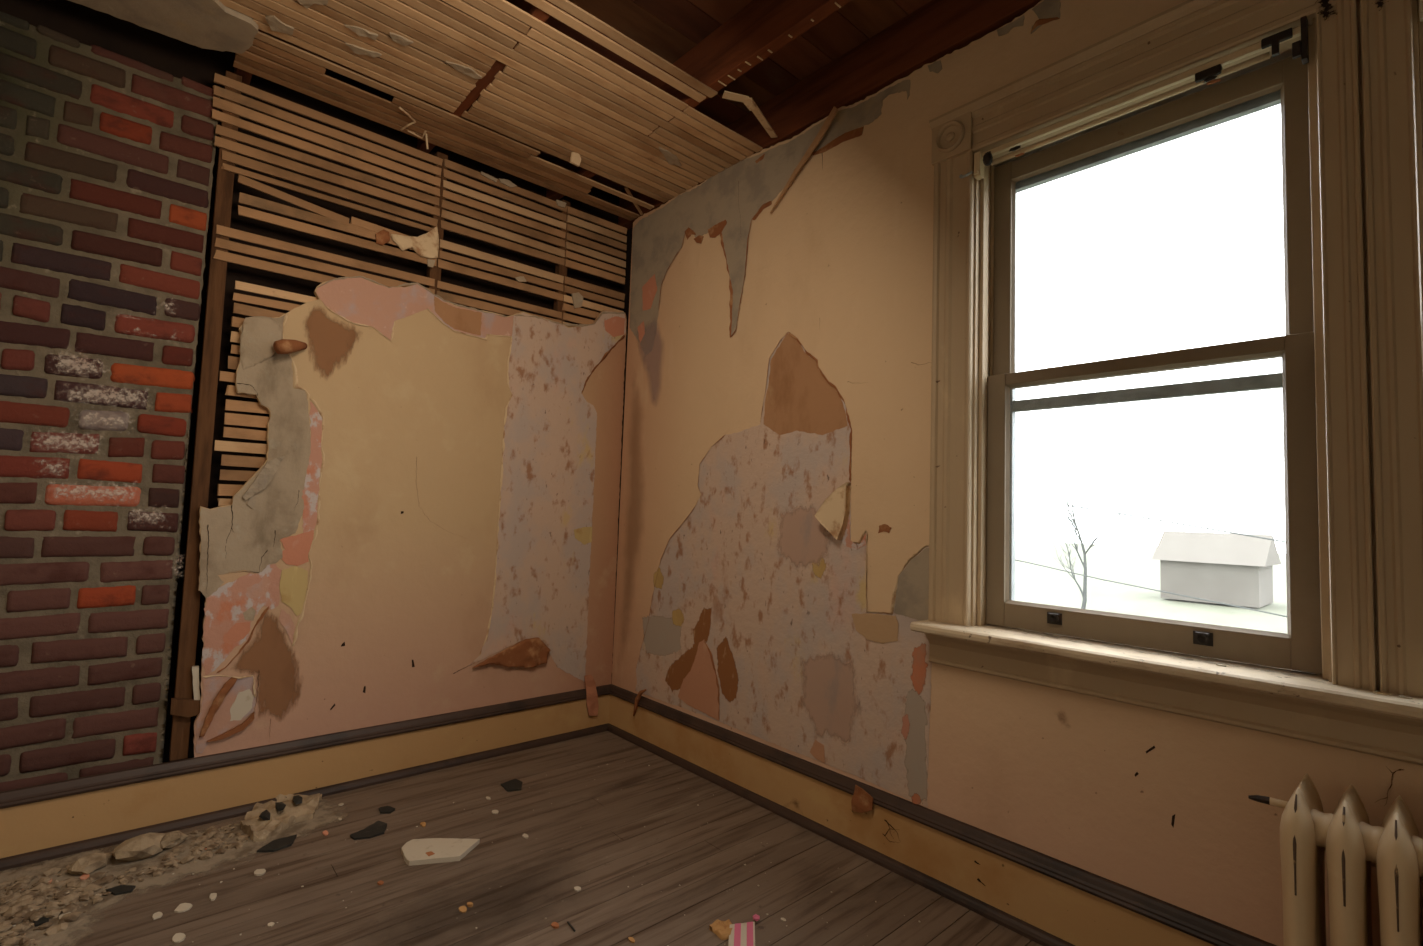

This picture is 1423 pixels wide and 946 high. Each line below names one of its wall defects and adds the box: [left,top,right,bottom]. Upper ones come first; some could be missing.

spalling [997,0,1061,36]
spalling [0,0,910,763]
flaking render [894,548,929,620]
peeling [501,779,523,792]